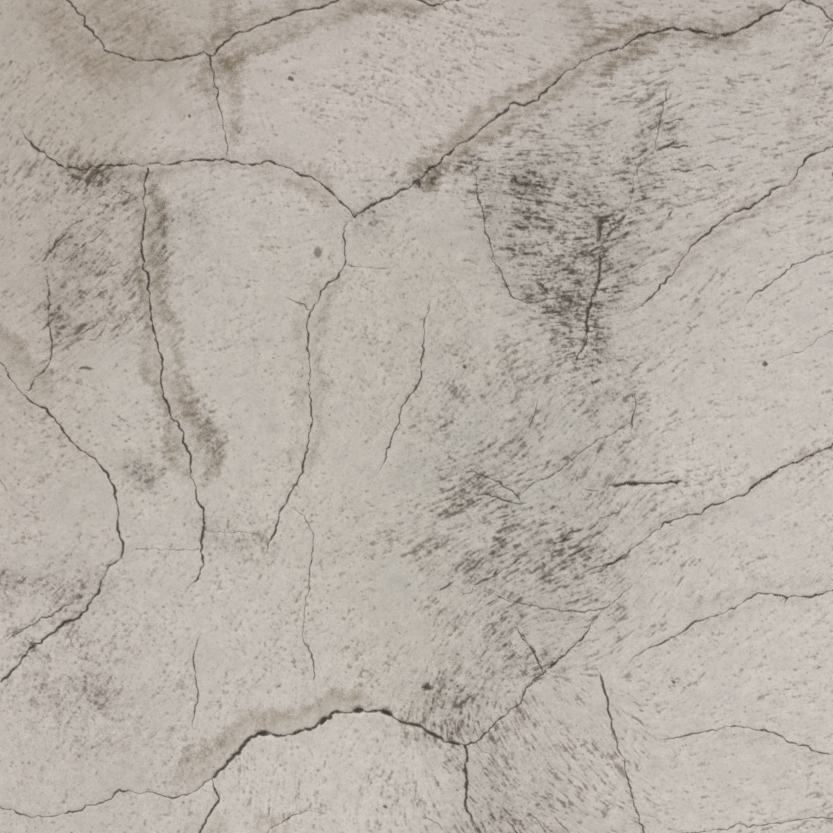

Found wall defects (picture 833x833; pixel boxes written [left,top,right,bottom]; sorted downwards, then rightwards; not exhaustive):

crack [27,0,833,580]
crack [1,291,124,682]
crack [0,789,128,818]
crack [153,598,608,833]
crack [600,676,644,832]
crack [641,592,825,653]